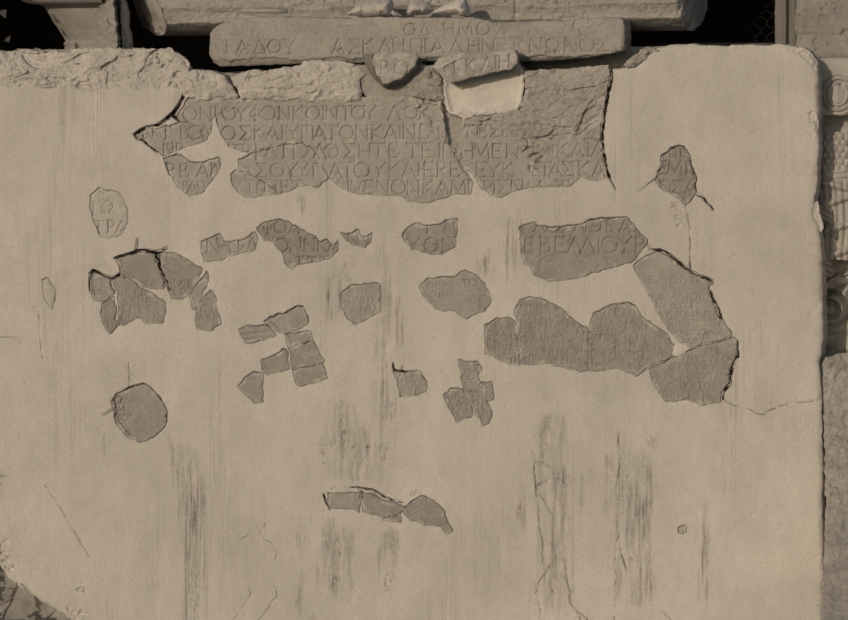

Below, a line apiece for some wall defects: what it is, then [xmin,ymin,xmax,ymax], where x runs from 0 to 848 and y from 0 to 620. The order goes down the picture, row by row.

crack [601,67,616,190]
crack [722,341,818,415]
crack [532,453,588,620]